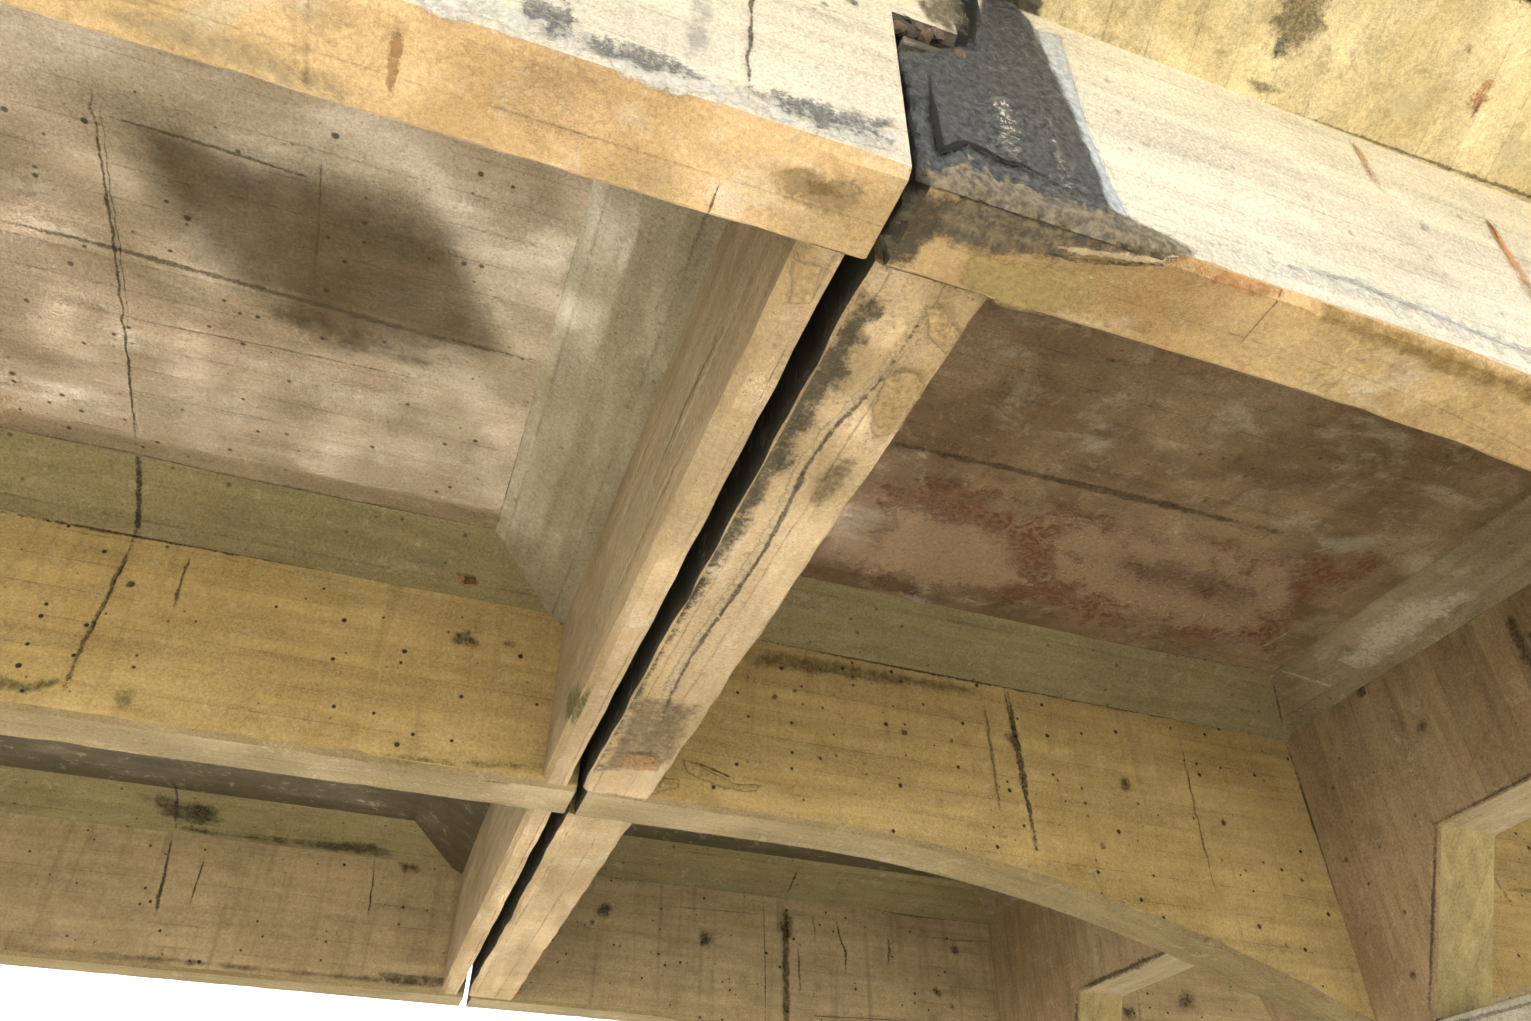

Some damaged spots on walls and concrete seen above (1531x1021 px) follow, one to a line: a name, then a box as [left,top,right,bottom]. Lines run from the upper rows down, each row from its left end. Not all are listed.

crack [745,0,755,88]
damp [1269,0,1332,57]
damp [155,142,480,346]
corrosion [1486,221,1530,288]
crack [67,108,142,679]
corrosion [853,477,1403,651]
damp [156,797,215,834]
damp [247,836,382,855]